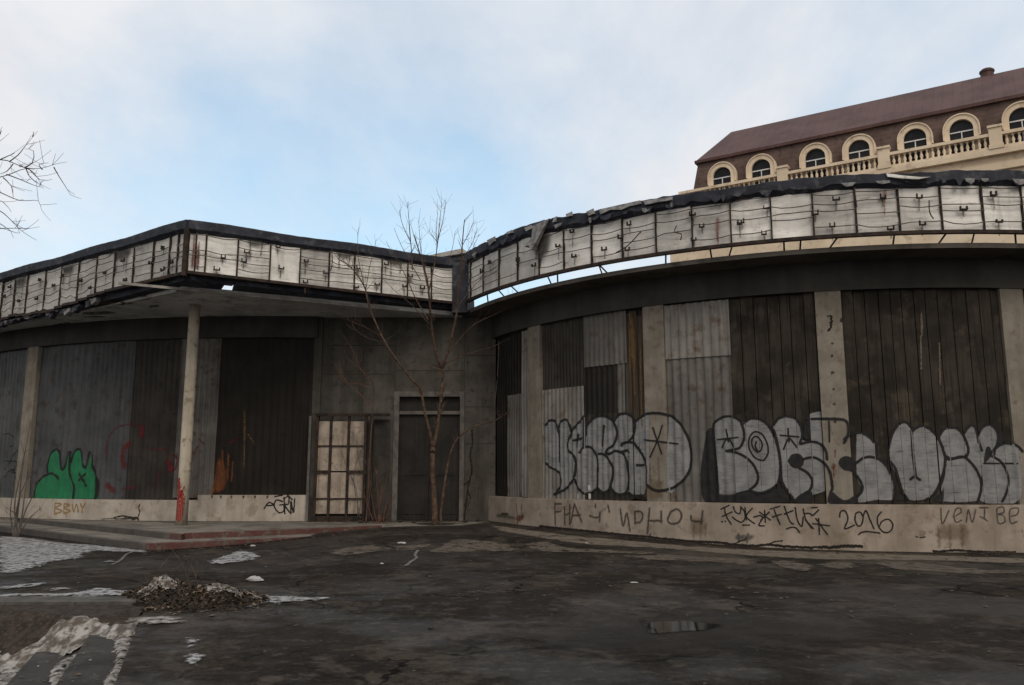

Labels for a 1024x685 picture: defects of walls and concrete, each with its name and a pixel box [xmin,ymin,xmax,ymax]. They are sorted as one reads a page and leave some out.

peeling [876,173,989,186]
peeling [586,197,674,224]
peeling [487,212,573,251]